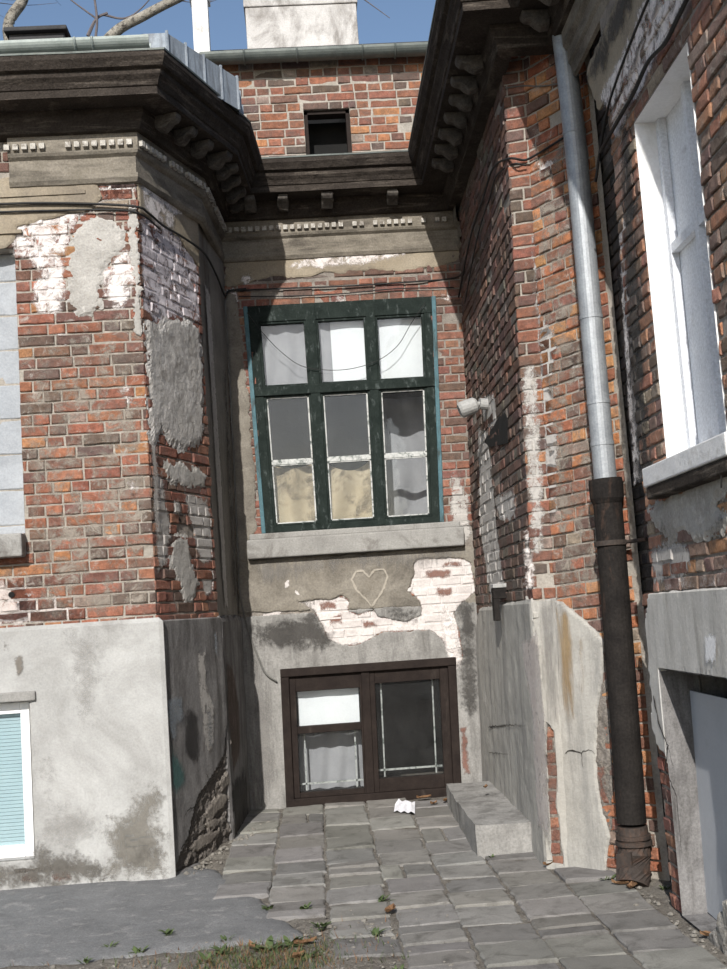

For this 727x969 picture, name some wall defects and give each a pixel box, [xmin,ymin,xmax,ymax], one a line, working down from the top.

peeling [12,212,85,315]
peeling [202,569,214,596]
damp [252,613,330,650]
spalling [285,558,475,661]
peeling [705,635,716,663]
spalling [176,665,240,873]